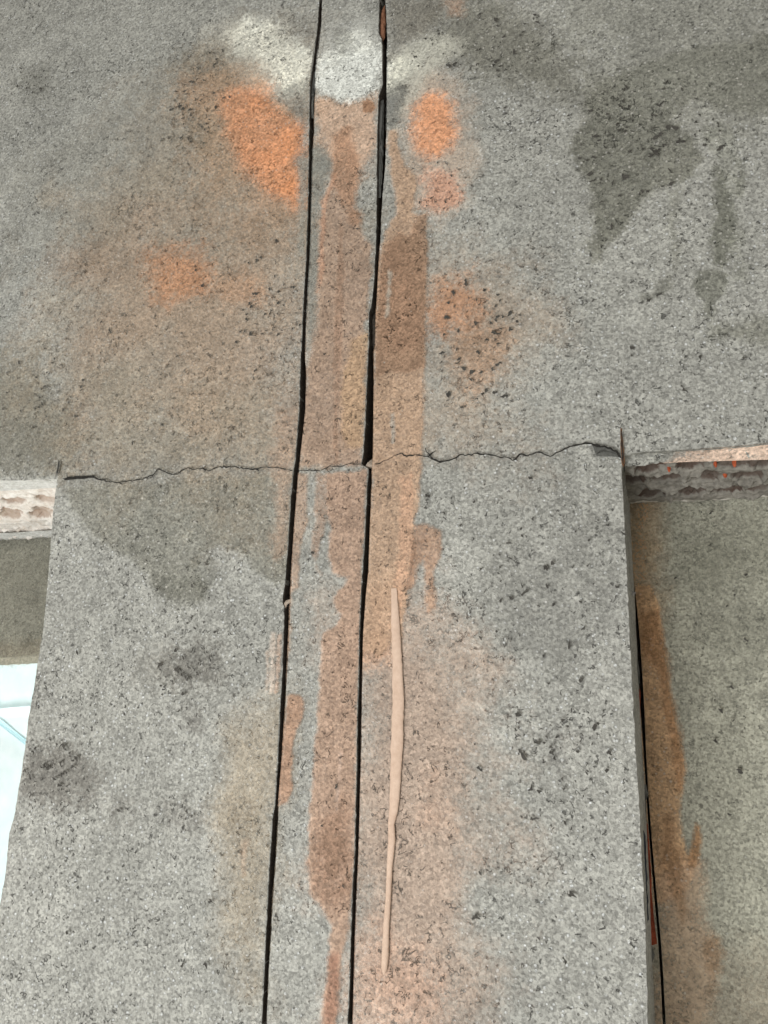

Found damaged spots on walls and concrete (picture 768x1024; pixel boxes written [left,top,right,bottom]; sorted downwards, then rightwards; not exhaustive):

efflorescence [231,18,419,125]
corrosion [223,88,302,203]
leakage [572,35,768,259]
leakage [695,166,735,313]
crack [63,442,593,484]
corrosion [292,95,471,1024]
corrosion [278,695,303,804]
corrosion [635,586,700,902]